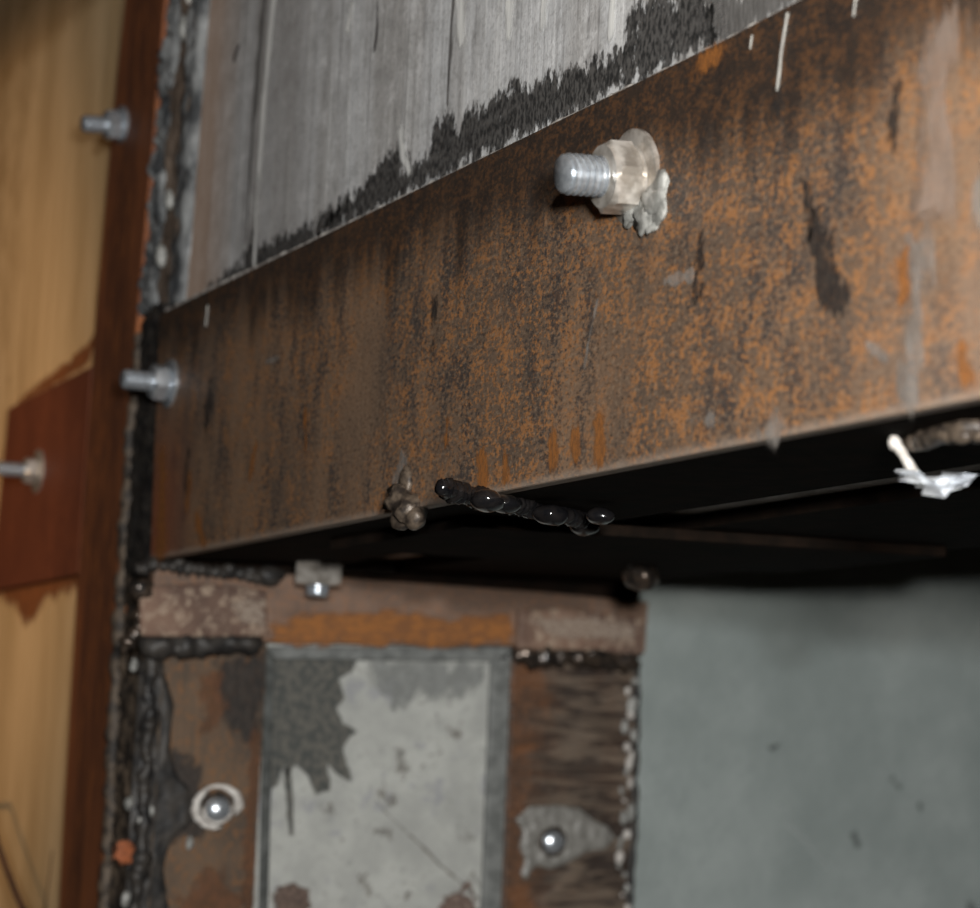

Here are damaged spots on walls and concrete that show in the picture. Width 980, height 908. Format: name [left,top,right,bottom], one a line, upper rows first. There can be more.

rust [698,44,723,73]
damp [887,80,902,151]
damp [692,231,705,305]
damp [802,181,850,318]
rust [897,246,910,305]
rust [958,338,975,389]
rust [270,610,515,648]
peeling [271,659,357,835]
rust [272,883,311,908]
rust [438,881,477,908]